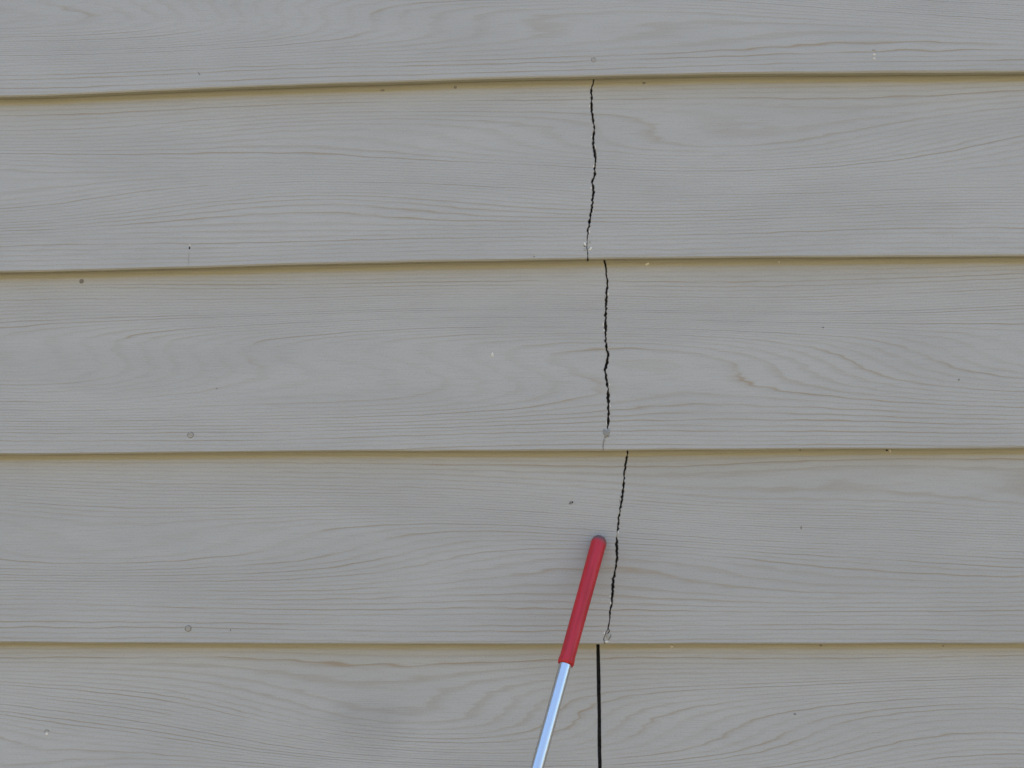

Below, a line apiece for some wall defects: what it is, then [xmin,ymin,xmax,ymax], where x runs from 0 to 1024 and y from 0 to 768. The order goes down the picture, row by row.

crack [584,83,628,644]